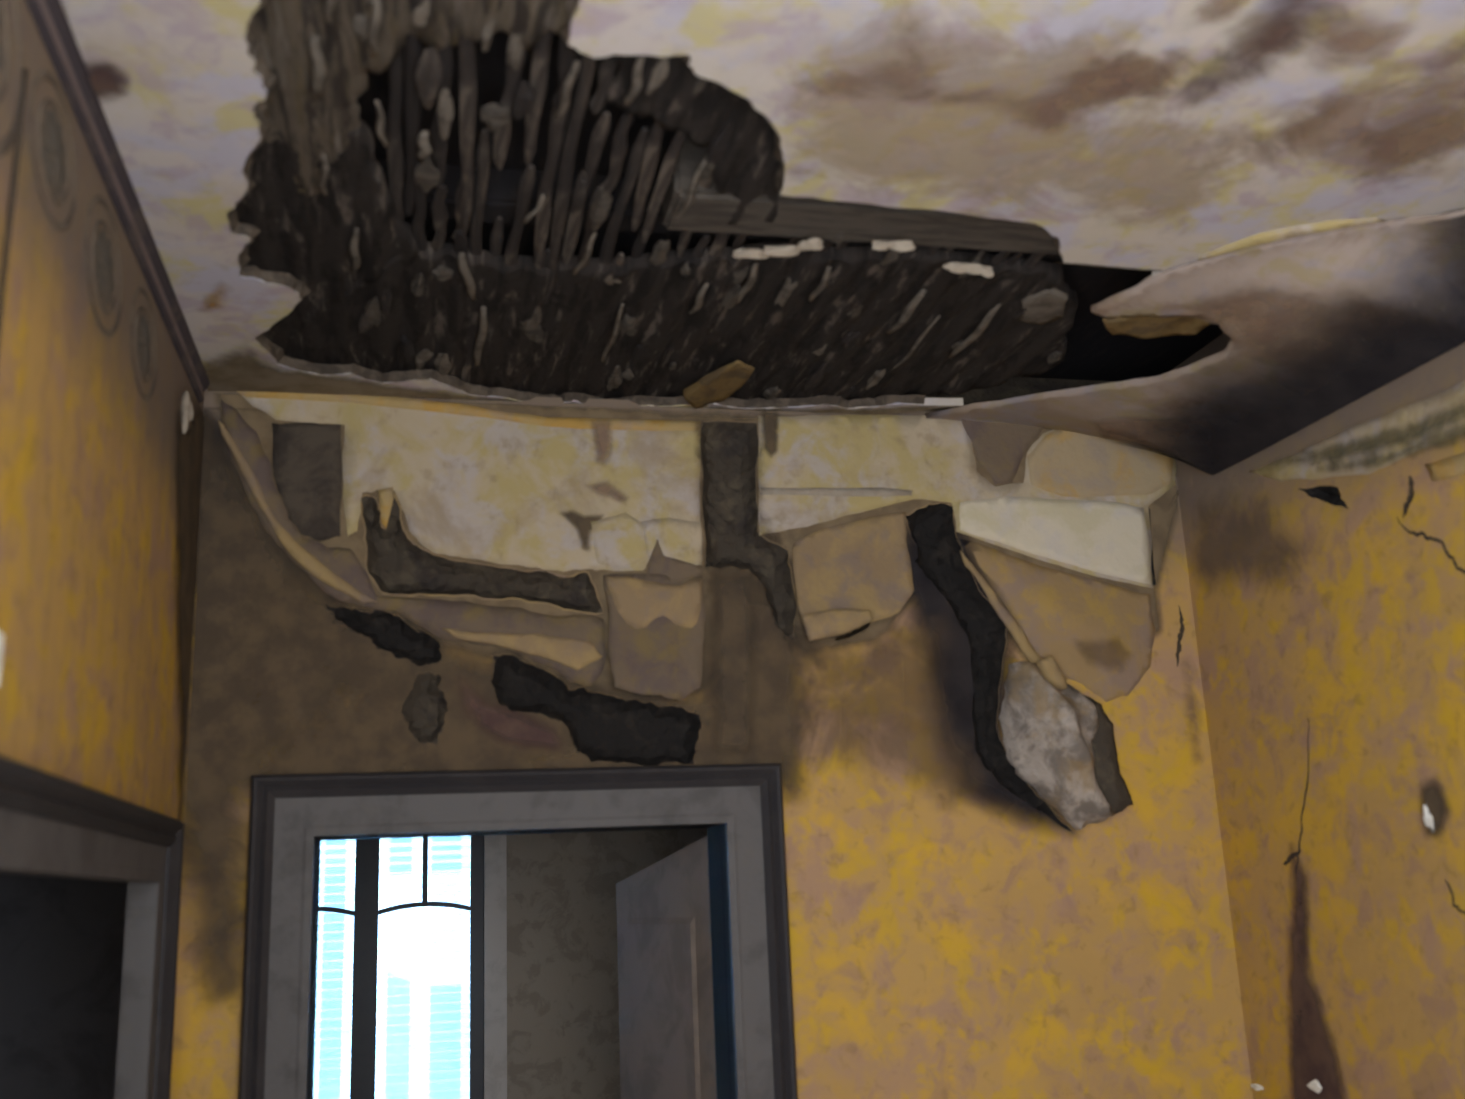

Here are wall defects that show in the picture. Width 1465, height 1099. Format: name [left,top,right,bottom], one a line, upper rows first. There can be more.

leakage [1017,61,1154,128]
leakage [1196,0,1318,93]
leakage [1324,28,1397,54]
leakage [1286,73,1465,172]
peeling [218,0,1178,834]
crack [1397,476,1465,574]